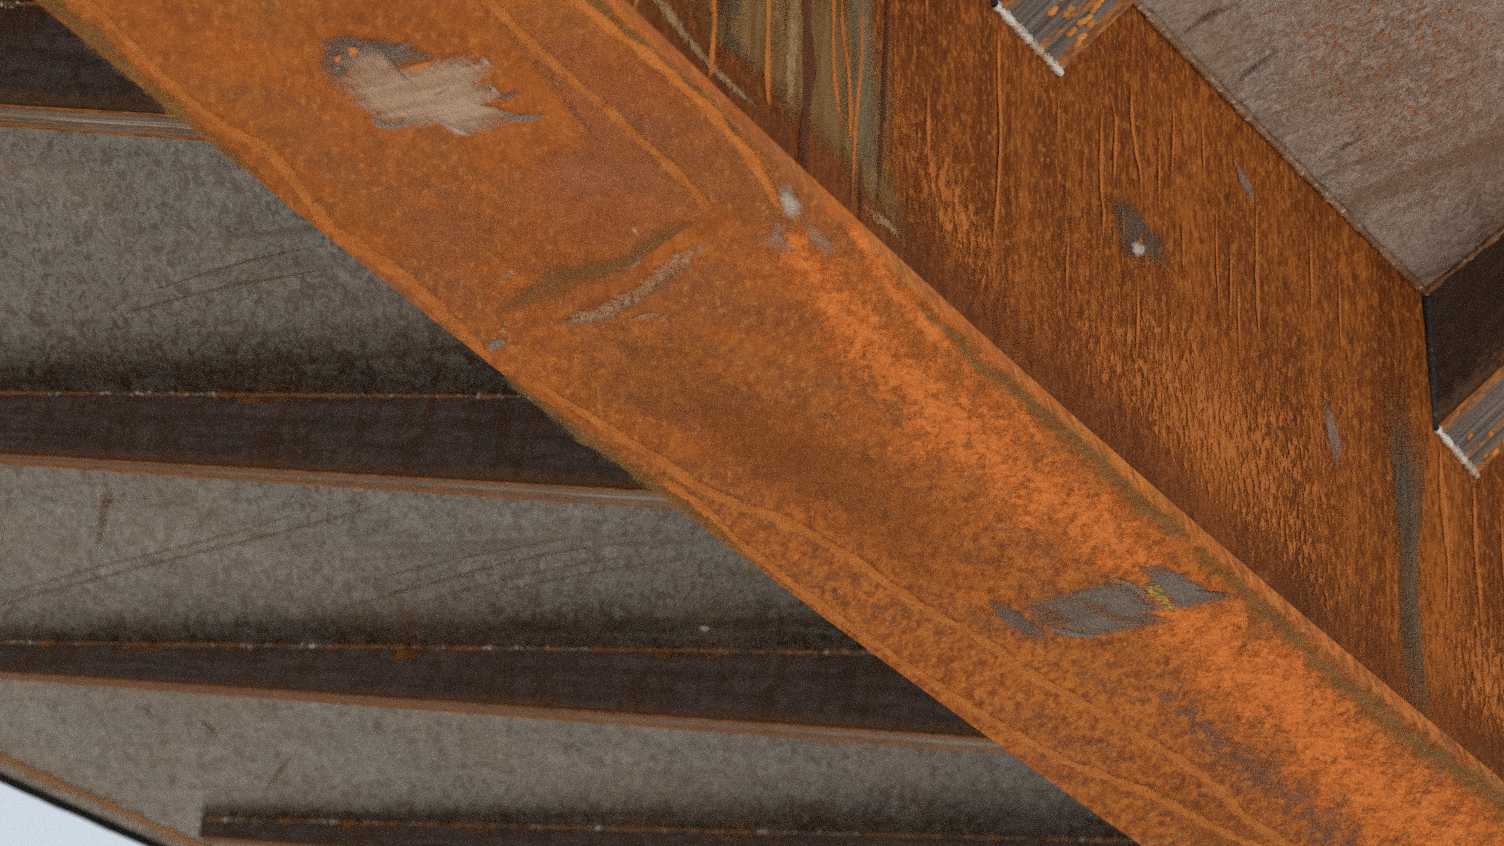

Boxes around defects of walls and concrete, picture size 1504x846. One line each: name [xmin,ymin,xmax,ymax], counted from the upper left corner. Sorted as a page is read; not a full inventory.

peeling [325,39,534,135]
corrosion [572,0,781,209]
corrosion [799,0,864,194]
corrosion [901,34,1008,311]
corrosion [780,207,1169,585]
peeling [920,306,1183,534]
corrosion [1020,211,1364,652]
peeling [1326,410,1339,455]
corrosion [530,378,1297,846]
peeling [995,549,1504,809]
corrosion [1152,589,1504,846]
corrosion [1439,453,1504,751]